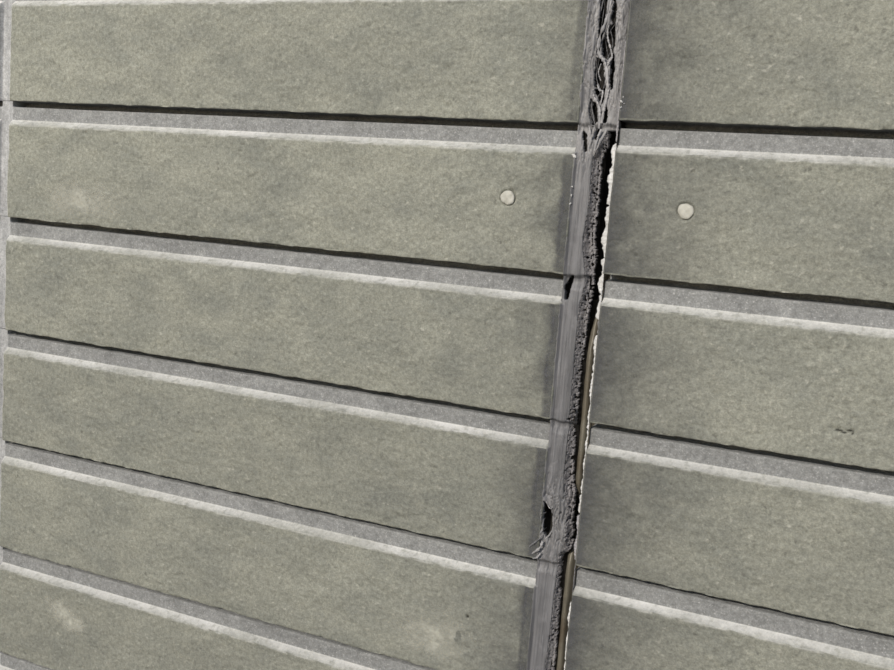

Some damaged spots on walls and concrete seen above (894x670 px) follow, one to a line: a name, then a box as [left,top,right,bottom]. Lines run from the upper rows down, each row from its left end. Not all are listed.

spalling [529,502,553,559]
crack [545,131,611,670]